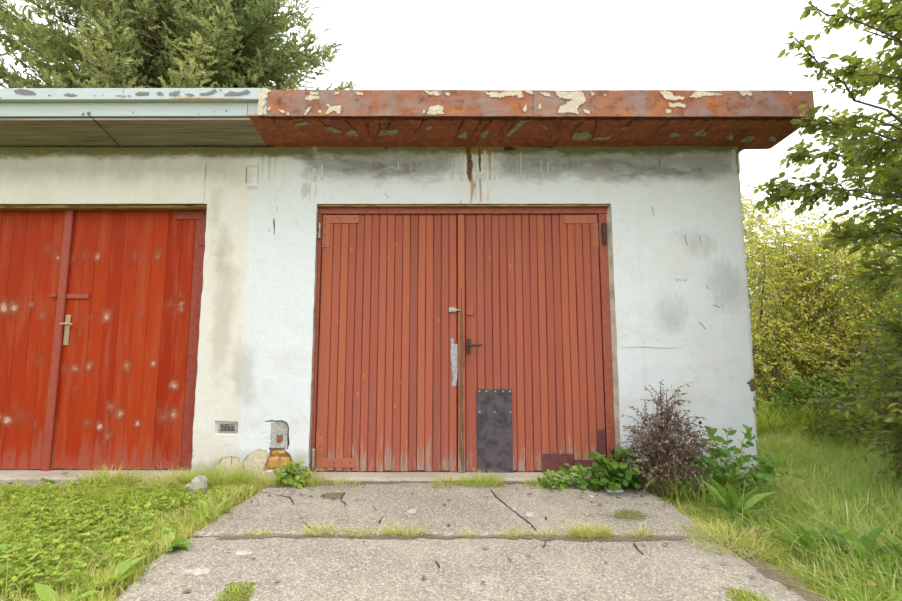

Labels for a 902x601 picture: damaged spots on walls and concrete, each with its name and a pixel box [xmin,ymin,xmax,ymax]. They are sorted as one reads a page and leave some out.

peeling [116,89,341,127]
peeling [422,90,450,115]
peeling [484,90,606,136]
peeling [660,90,723,114]
peeling [571,132,612,141]
damp [0,146,736,182]
rust [247,114,802,198]
spalling [215,420,292,478]
crack [491,490,549,548]